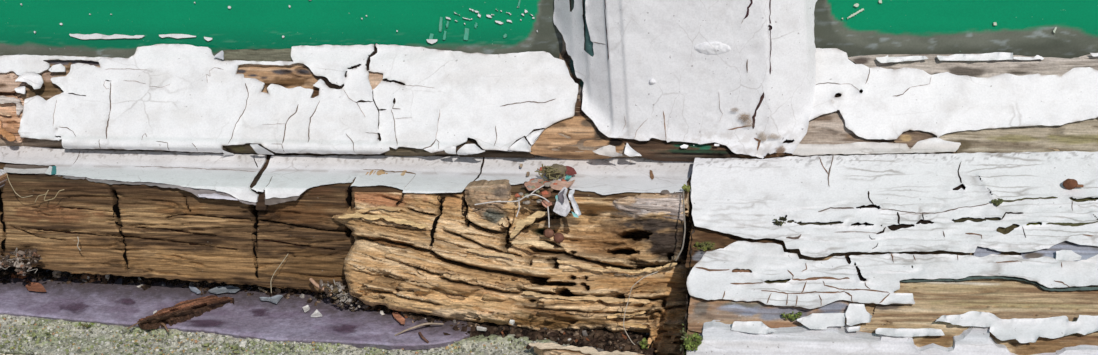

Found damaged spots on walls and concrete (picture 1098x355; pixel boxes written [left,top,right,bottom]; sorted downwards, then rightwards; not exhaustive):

peeling [0,56,100,101]
crack [0,43,440,278]
peeling [221,143,288,211]
crack [430,99,554,246]
peeling [384,50,751,162]
crack [719,0,793,159]
crack [816,68,870,97]
peeling [800,110,1098,153]
peeling [685,226,790,268]
crack [696,154,1098,305]
peeling [1020,241,1098,261]
peeling [688,278,1098,355]